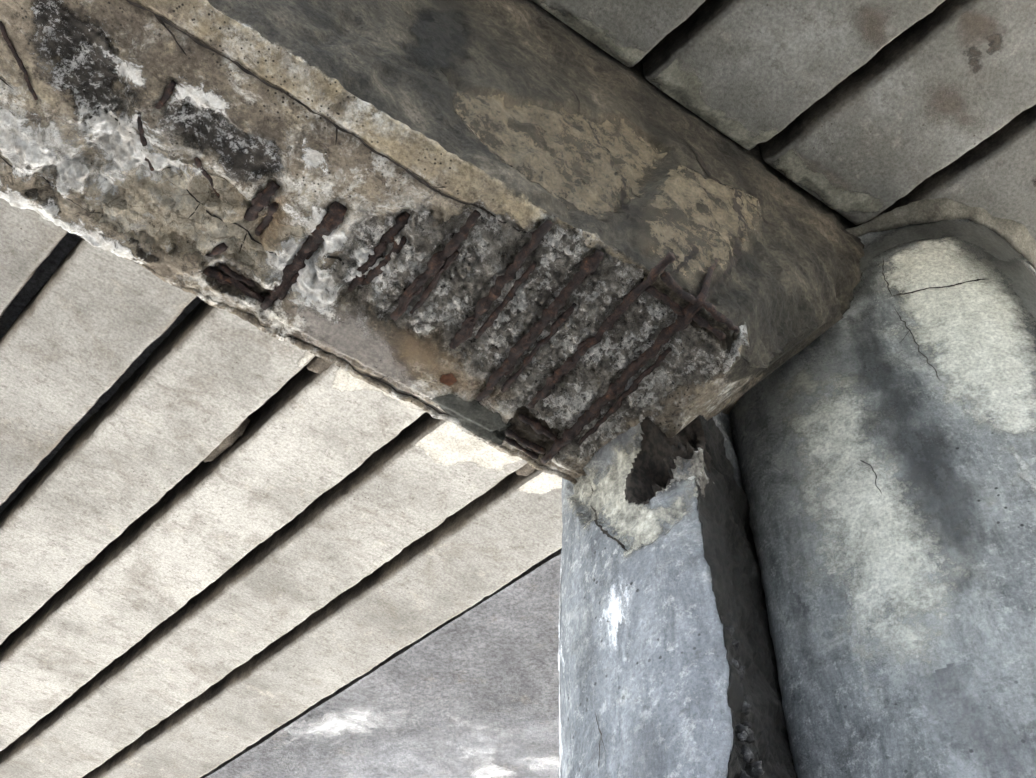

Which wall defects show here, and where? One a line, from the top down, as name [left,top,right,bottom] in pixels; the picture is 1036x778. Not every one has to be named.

damp [0,105,202,264]
damp [94,42,145,86]
crack [77,88,281,261]
damp [174,76,230,115]
damp [302,139,328,174]
crack [126,0,564,255]
damp [256,204,408,383]
crack [323,252,350,268]
spalling [0,0,750,558]
rust [440,373,458,386]
crack [882,260,986,381]
crack [583,486,627,551]